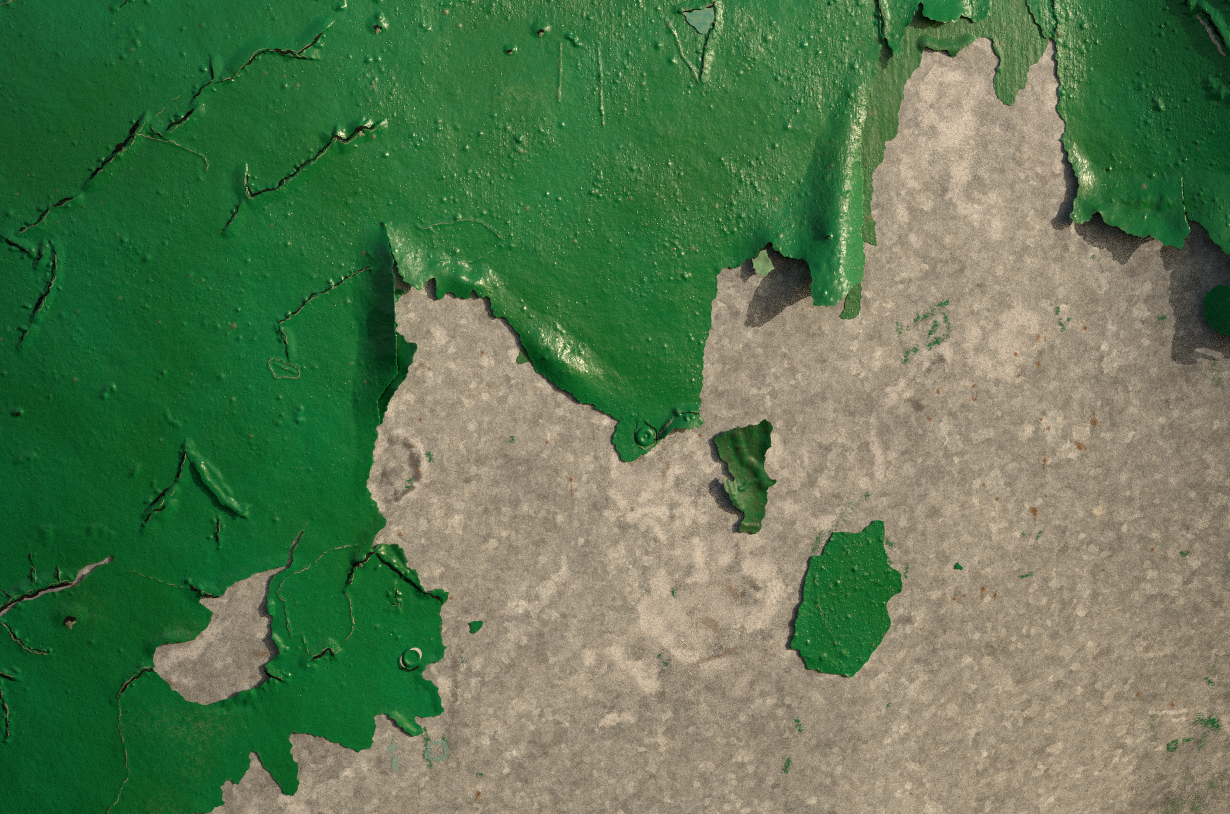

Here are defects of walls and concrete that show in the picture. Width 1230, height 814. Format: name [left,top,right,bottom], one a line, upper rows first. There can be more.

crack [1185,0,1226,56]
crack [6,30,324,341]
crack [227,124,375,225]
peeling [804,70,877,307]
peeling [860,0,1049,246]
peeling [1063,143,1191,249]
crack [278,266,370,357]
peeling [383,225,530,334]
peeling [714,419,777,534]
crack [0,553,72,740]
peeling [153,531,303,705]
peeling [790,520,903,677]